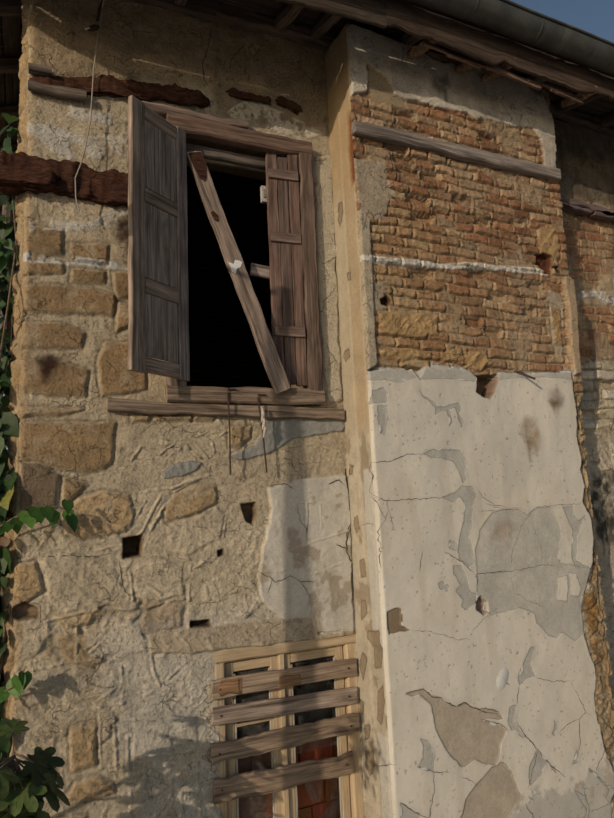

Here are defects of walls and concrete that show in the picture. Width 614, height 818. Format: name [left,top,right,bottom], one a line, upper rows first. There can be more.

spalling [535,257,546,274]
crack [258,571,311,596]
flaking render [424,448,591,641]
crack [445,492,574,606]
mould [591,472,614,542]
flaking render [518,647,536,684]
flaking render [407,689,547,818]
crack [402,689,589,818]
crack [538,678,609,786]
flaking render [400,803,419,818]